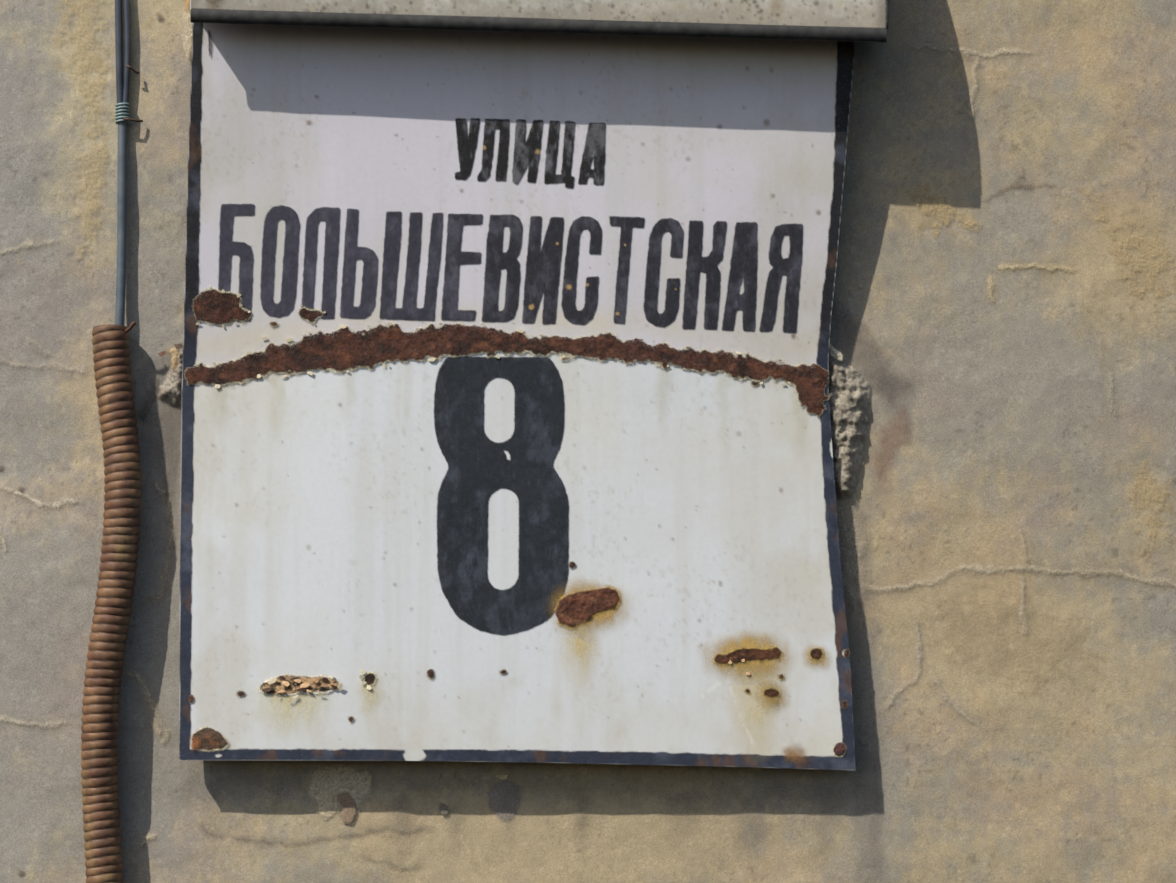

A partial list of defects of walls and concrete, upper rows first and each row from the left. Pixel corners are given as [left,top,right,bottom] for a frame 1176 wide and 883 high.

crack [864,530,1176,634]
crack [0,714,66,729]